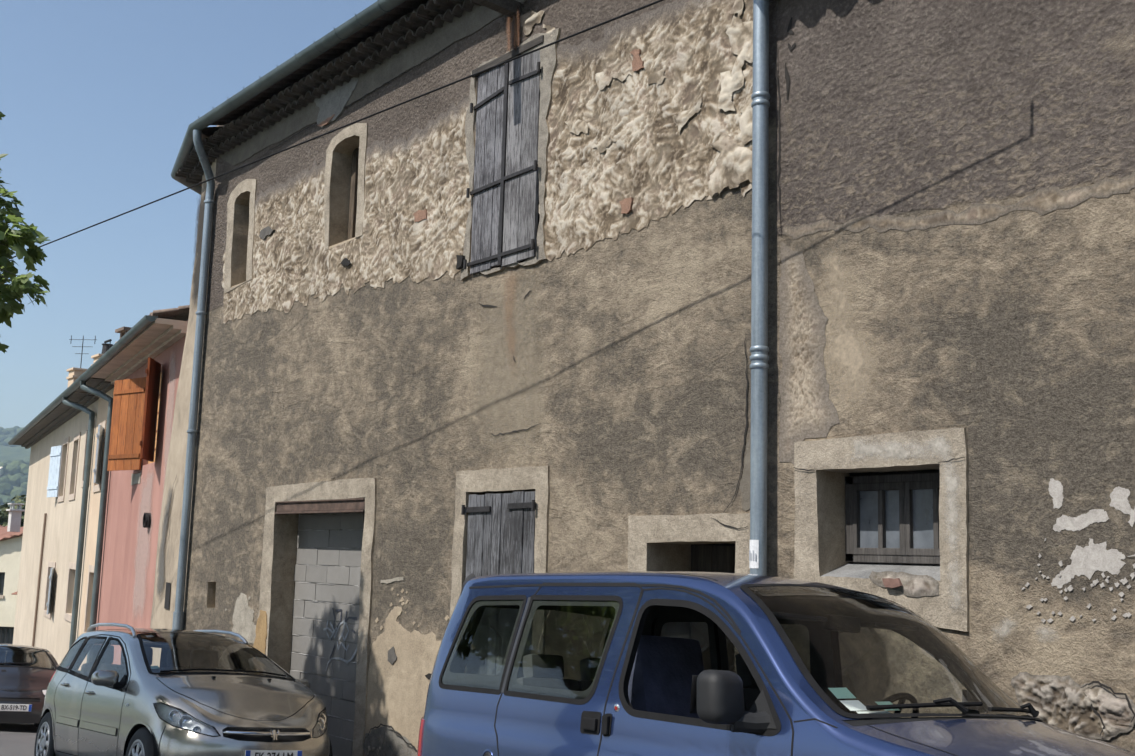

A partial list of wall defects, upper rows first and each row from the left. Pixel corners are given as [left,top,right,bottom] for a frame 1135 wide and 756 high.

spalling [222,94,479,324]
spalling [523,0,753,264]
crack [785,17,796,100]
crack [713,337,748,529]
peeling [1022,478,1135,623]
peeling [365,588,441,750]
spalling [1011,672,1135,740]